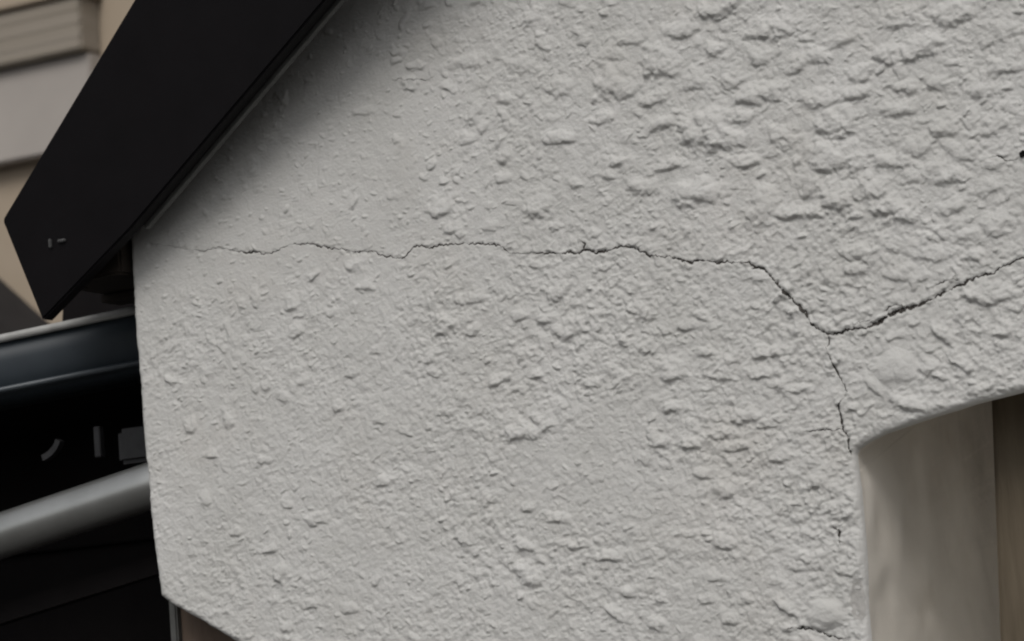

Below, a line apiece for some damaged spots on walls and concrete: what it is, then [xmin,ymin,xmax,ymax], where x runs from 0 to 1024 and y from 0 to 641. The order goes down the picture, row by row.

crack [148,242,1024,453]